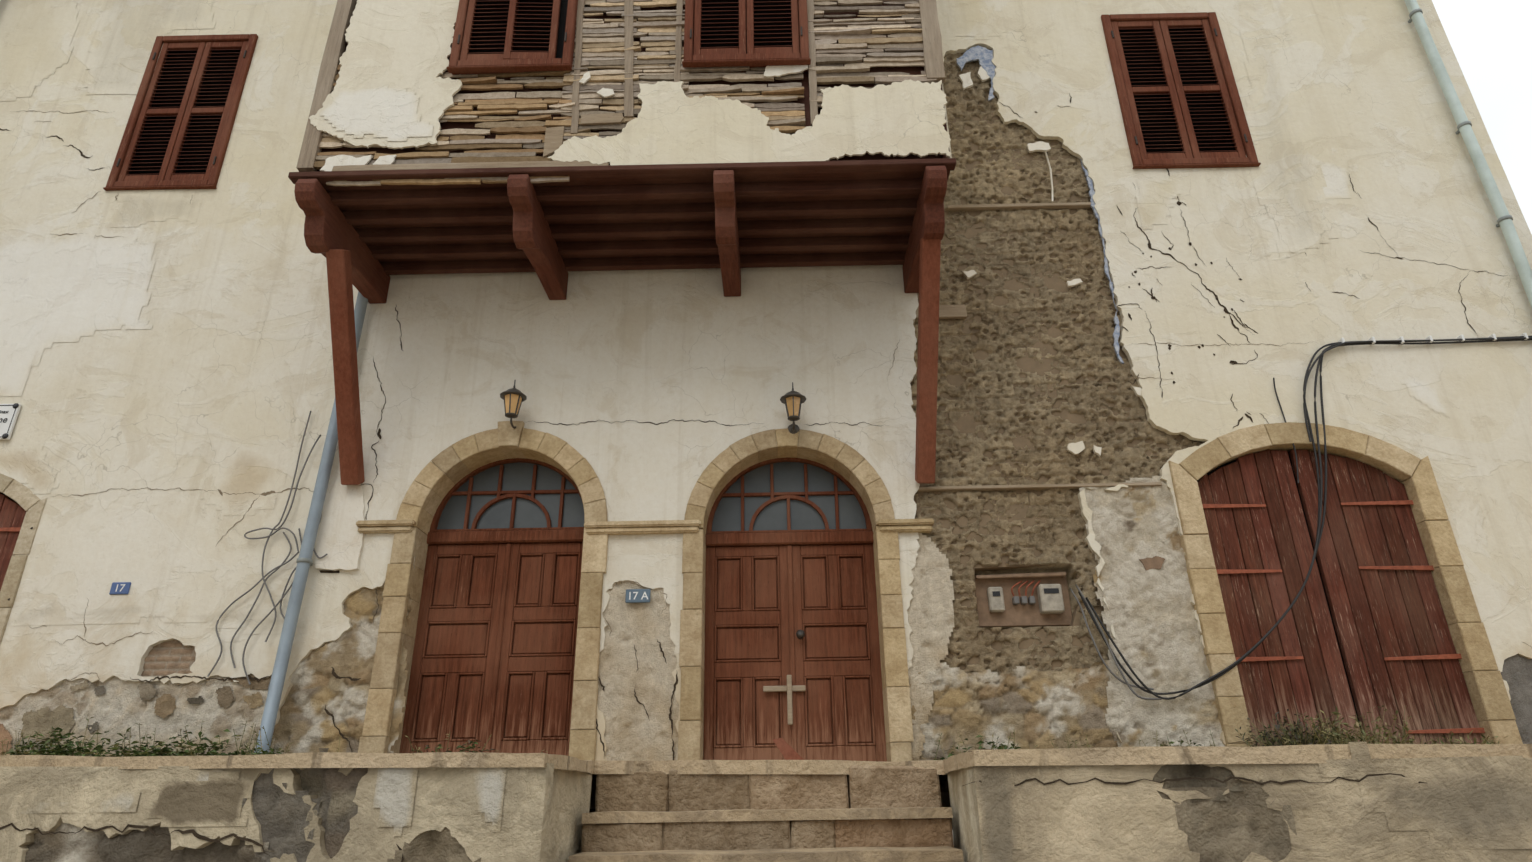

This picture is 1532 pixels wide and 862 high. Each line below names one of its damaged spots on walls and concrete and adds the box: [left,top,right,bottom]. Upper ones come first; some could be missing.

peeling [320,85,434,171]
flaking render [579,71,615,98]
flaking render [764,65,808,78]
crack [1117,168,1309,428]
crack [1349,174,1502,334]
flaking render [907,45,1225,761]
flaking render [0,587,384,862]
flaking render [387,594,413,753]
flaking render [387,827,481,862]
flaking render [598,581,679,761]
flaking render [939,780,949,793]
flaking render [1501,654,1532,744]